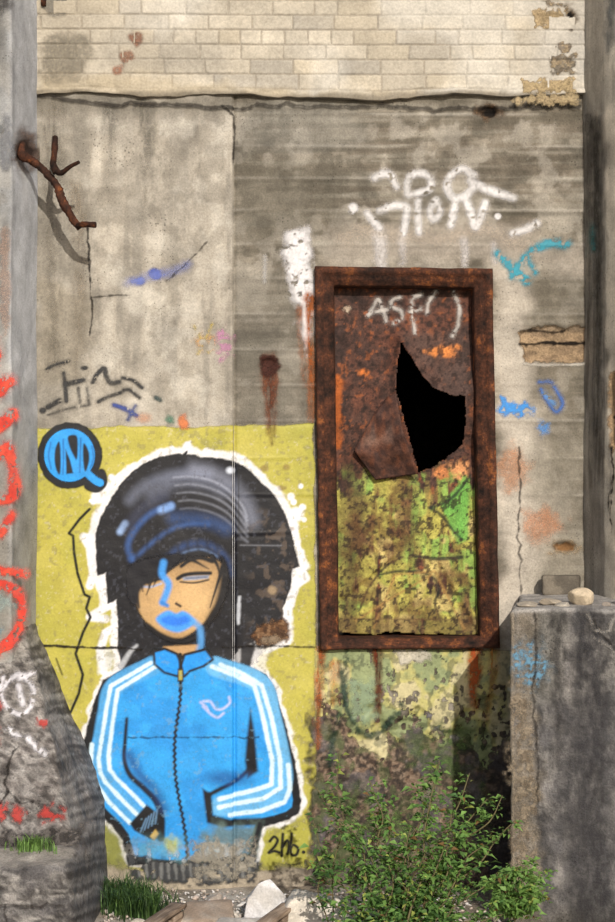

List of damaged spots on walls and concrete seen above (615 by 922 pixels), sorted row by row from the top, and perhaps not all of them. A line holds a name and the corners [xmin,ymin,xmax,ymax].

spalling [532,0,576,29]
spalling [511,41,579,106]
spalling [473,104,503,120]
crack [87,227,113,334]
spalling [518,325,585,366]
corrosion [260,355,281,428]
spalling [607,371,615,453]
crack [607,447,615,525]
corrosion [468,648,494,708]